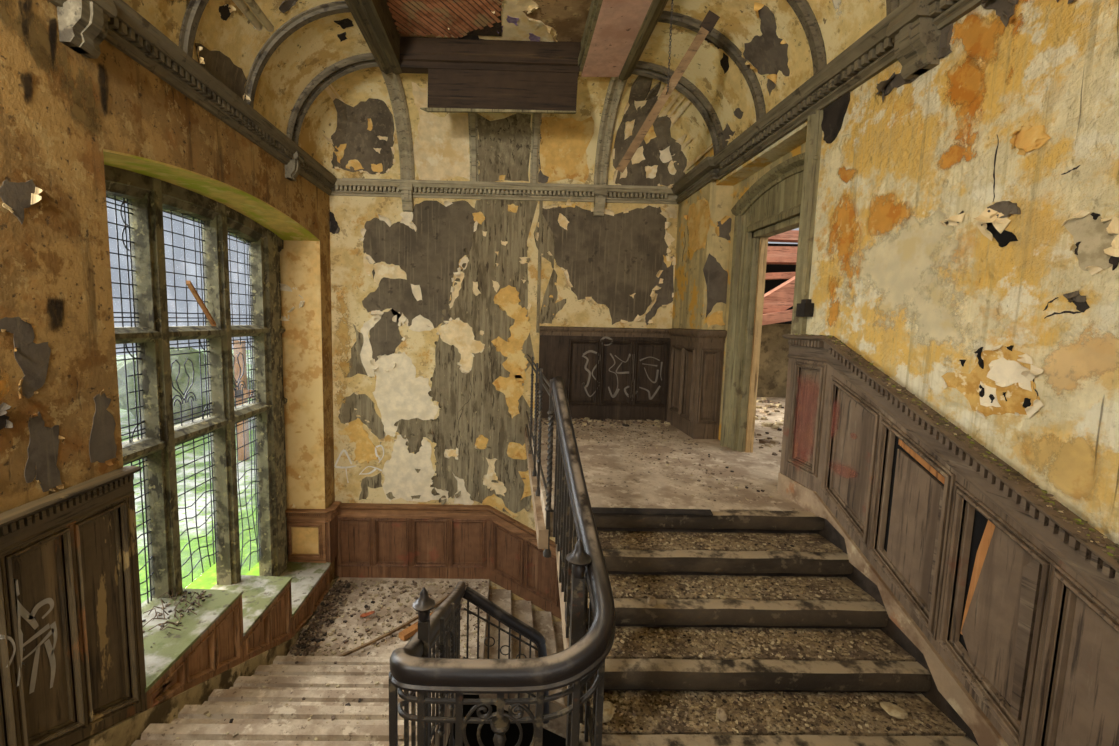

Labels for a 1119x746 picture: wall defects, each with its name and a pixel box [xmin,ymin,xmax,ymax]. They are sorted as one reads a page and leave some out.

peeling [436,0,558,42]
peeling [704,2,790,95]
peeling [322,84,396,175]
peeling [412,82,594,183]
peeling [612,75,743,188]
peeling [329,209,340,234]
flaking render [1061,210,1119,275]
peeling [0,317,51,430]
flaking render [337,197,732,518]
flaking render [843,201,1044,419]
flaking render [1063,291,1090,312]
damp [1023,399,1104,499]